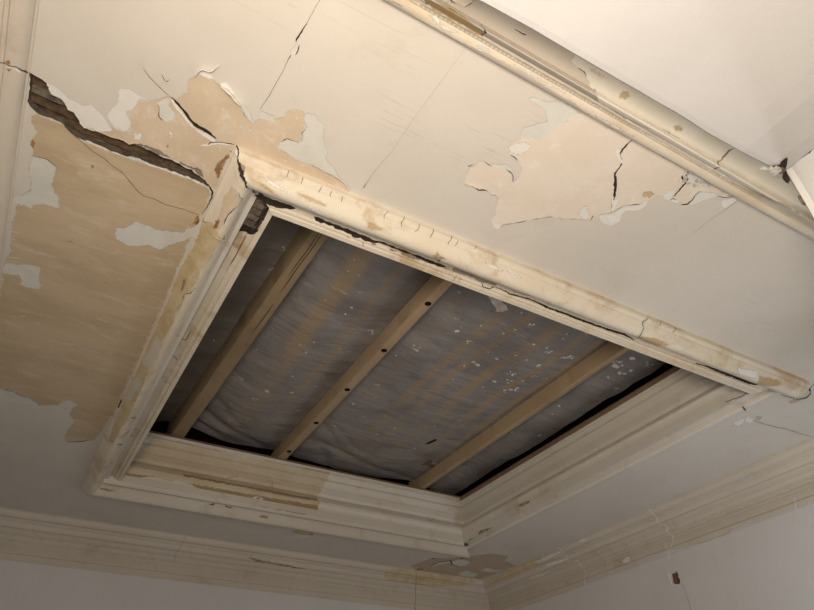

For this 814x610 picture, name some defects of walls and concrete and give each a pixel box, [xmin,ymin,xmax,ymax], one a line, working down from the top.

crack [0,60,28,73]
crack [262,3,318,106]
crack [76,137,204,222]
crack [143,68,256,194]
peeling [394,0,814,238]
crack [611,112,680,211]
peeling [0,65,351,443]
peeling [411,554,515,579]